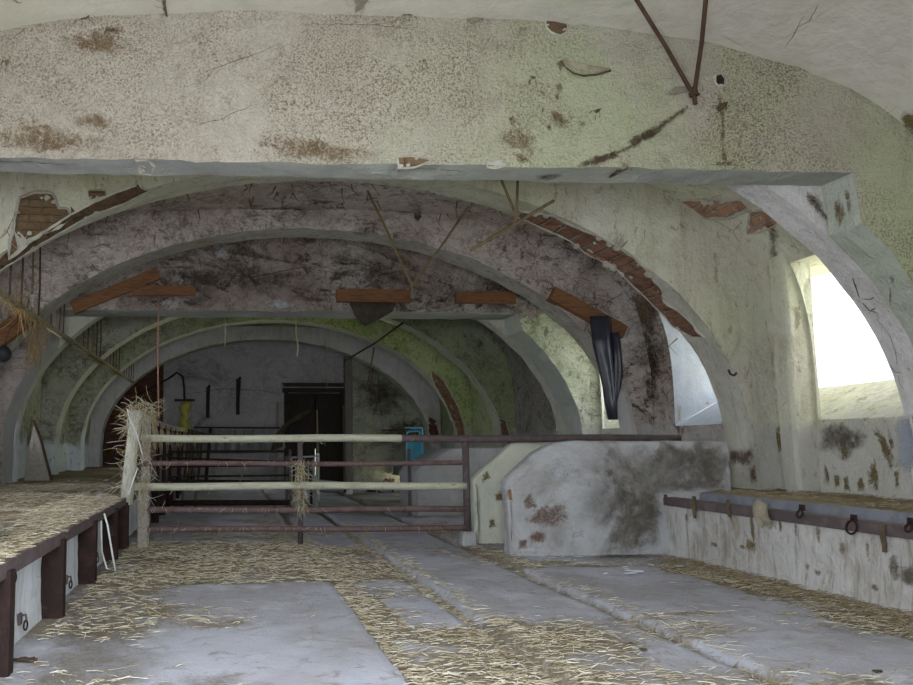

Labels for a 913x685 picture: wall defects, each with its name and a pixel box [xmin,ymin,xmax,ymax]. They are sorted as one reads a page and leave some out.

peeling [561,59,611,77]
flaking render [396,155,432,171]
leakage [582,108,685,177]
flaking render [0,159,156,271]
flaking render [677,197,778,235]
flaking render [518,210,705,338]
flaking render [430,370,466,435]
leakage [824,426,859,456]